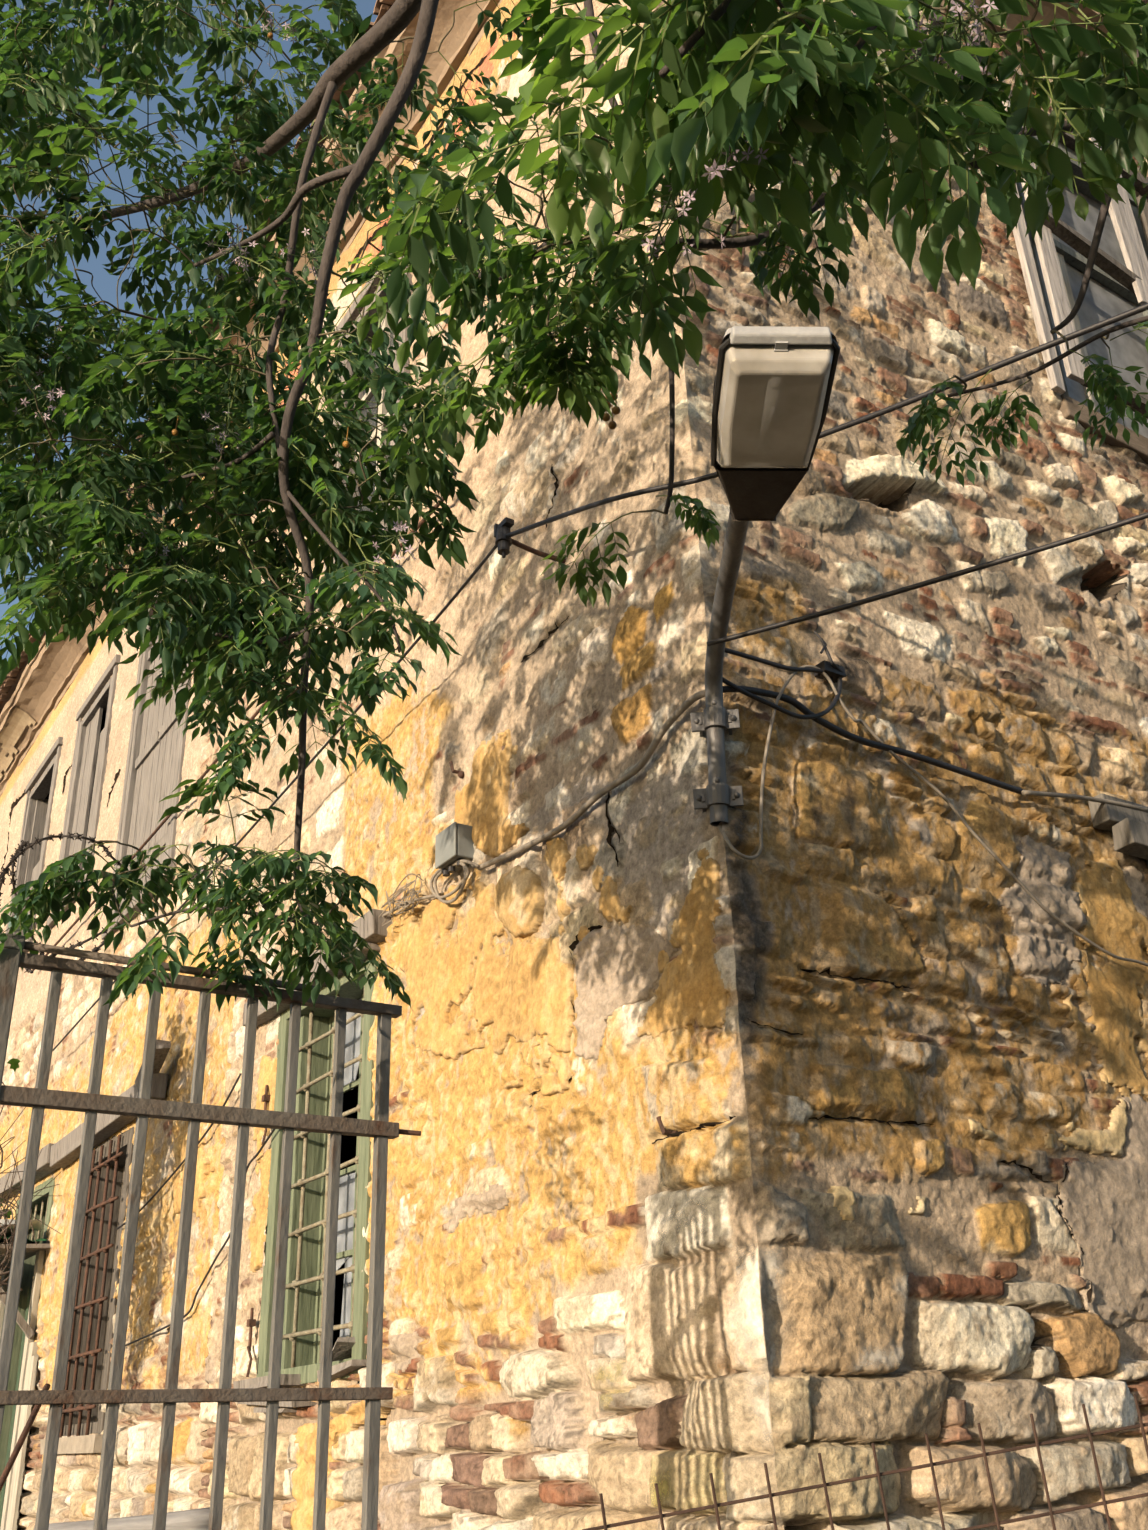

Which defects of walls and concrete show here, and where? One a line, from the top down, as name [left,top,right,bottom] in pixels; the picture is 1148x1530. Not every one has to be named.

hole [1080,574,1128,602]
crack [605,792,620,866]
flaking render [400,729,728,1096]
crack [652,1116,736,1144]
crack [809,1115,934,1131]
flaking render [827,1186,856,1220]
flaking render [908,1196,927,1215]
crack [1000,1160,1092,1303]